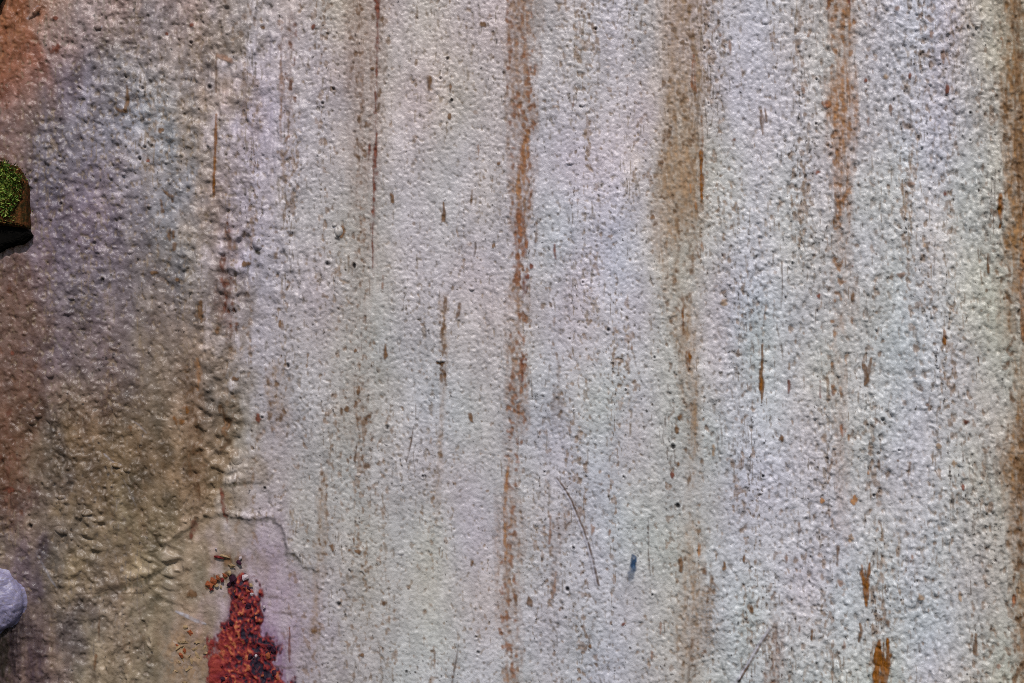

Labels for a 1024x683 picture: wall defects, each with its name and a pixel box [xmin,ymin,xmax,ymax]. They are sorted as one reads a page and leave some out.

rust [508,0,537,310]
rust [661,35,703,244]
rust [822,66,869,162]
rust [509,346,527,415]
water stain [0,623,43,683]
rust [187,548,296,683]
rust [503,508,532,627]
rust [872,618,892,683]